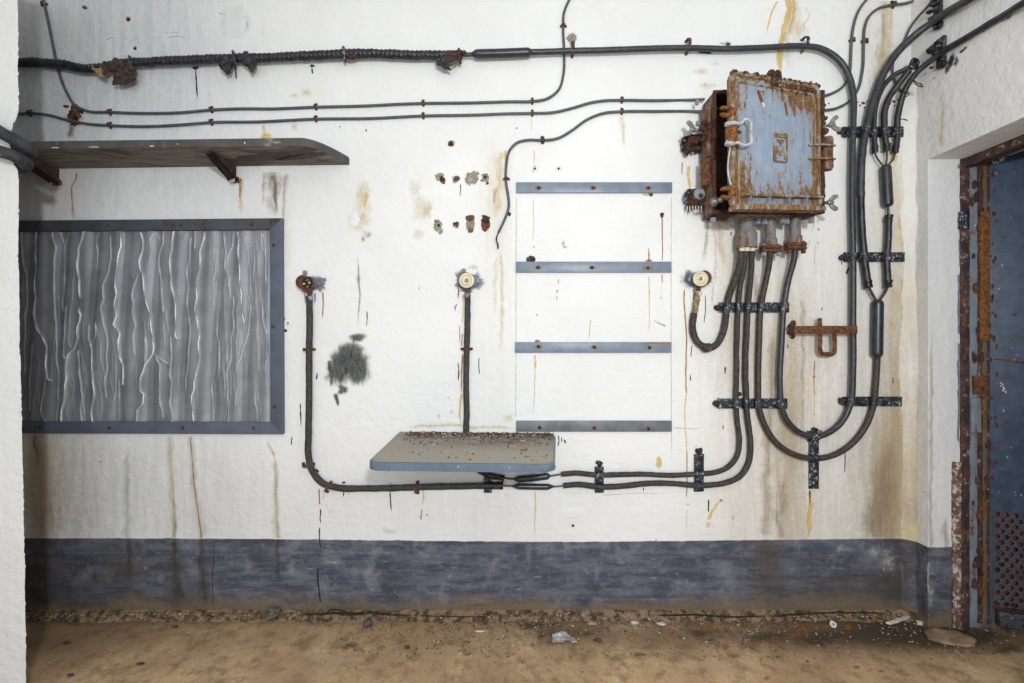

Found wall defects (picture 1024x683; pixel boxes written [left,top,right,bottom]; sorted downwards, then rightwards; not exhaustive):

damp [767,0,795,69]
spalling [434,170,490,185]
spalling [433,214,491,234]
rust [963,168,997,264]
rust [962,272,998,384]
rust [961,414,999,605]